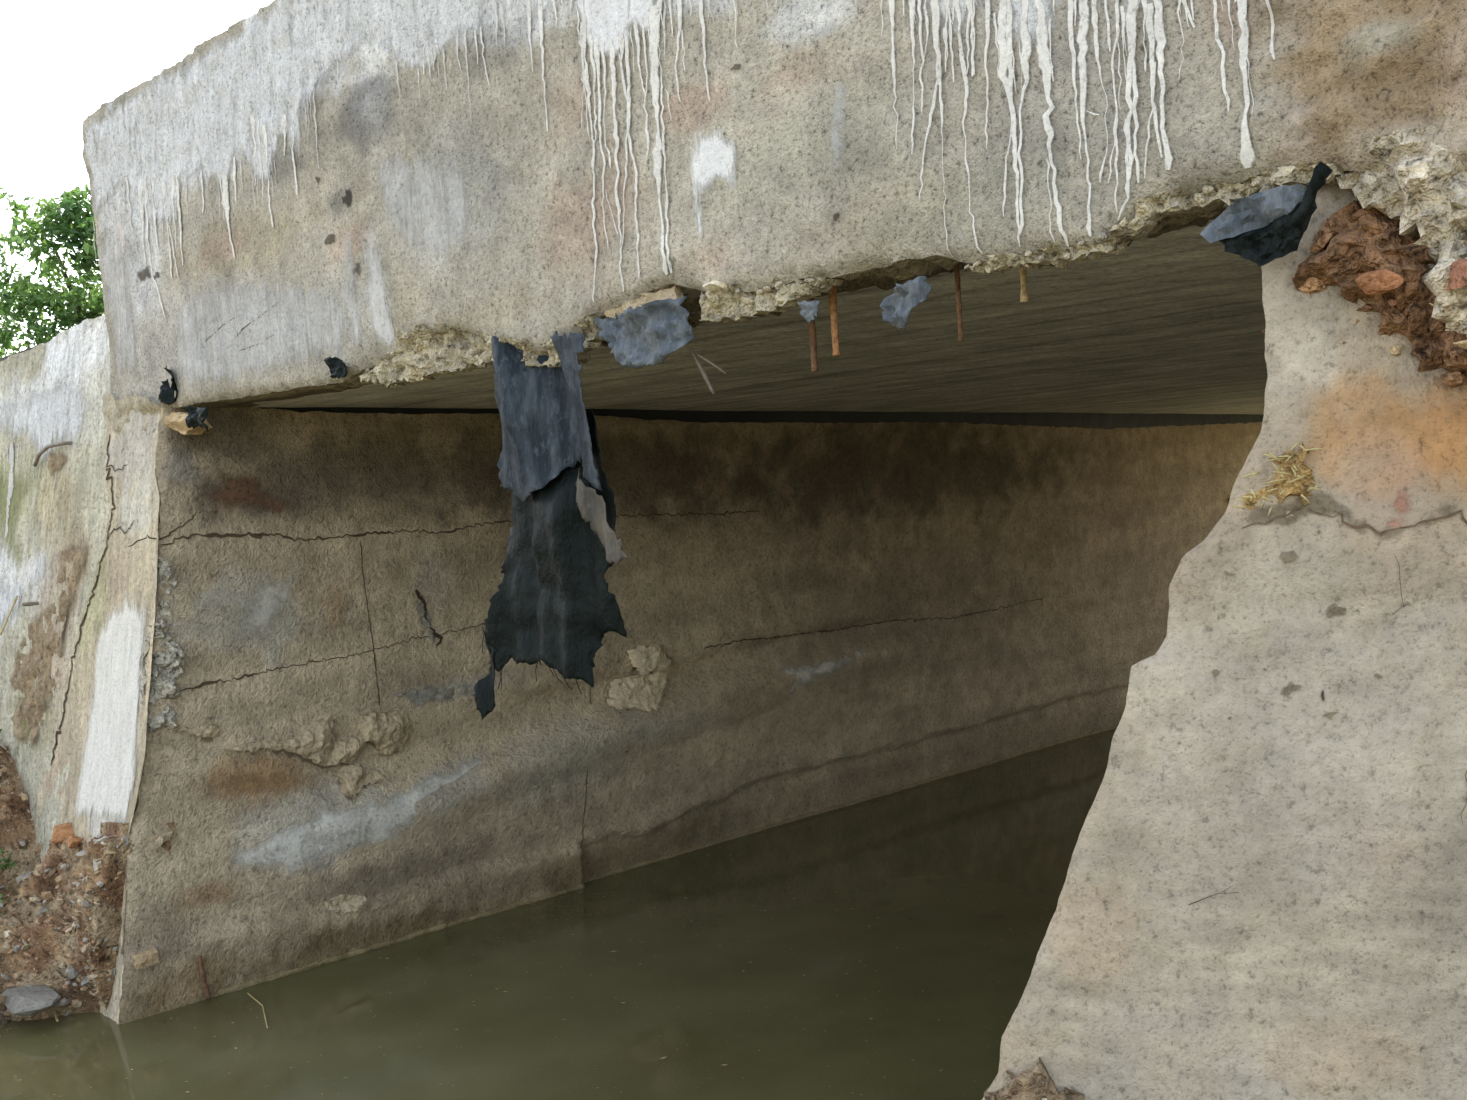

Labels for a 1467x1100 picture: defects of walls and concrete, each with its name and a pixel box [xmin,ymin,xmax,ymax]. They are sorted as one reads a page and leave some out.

efflorescence [85,0,738,317]
efflorescence [880,0,1195,258]
efflorescence [1213,0,1255,169]
efflorescence [367,249,394,343]
spalling [355,276,844,388]
spalling [954,159,1348,342]
flaking render [139,556,409,800]
crack [51,434,512,763]
flaking render [607,644,671,711]
crack [616,510,760,518]
crack [705,597,1044,648]
flaking render [984,1057,1084,1100]